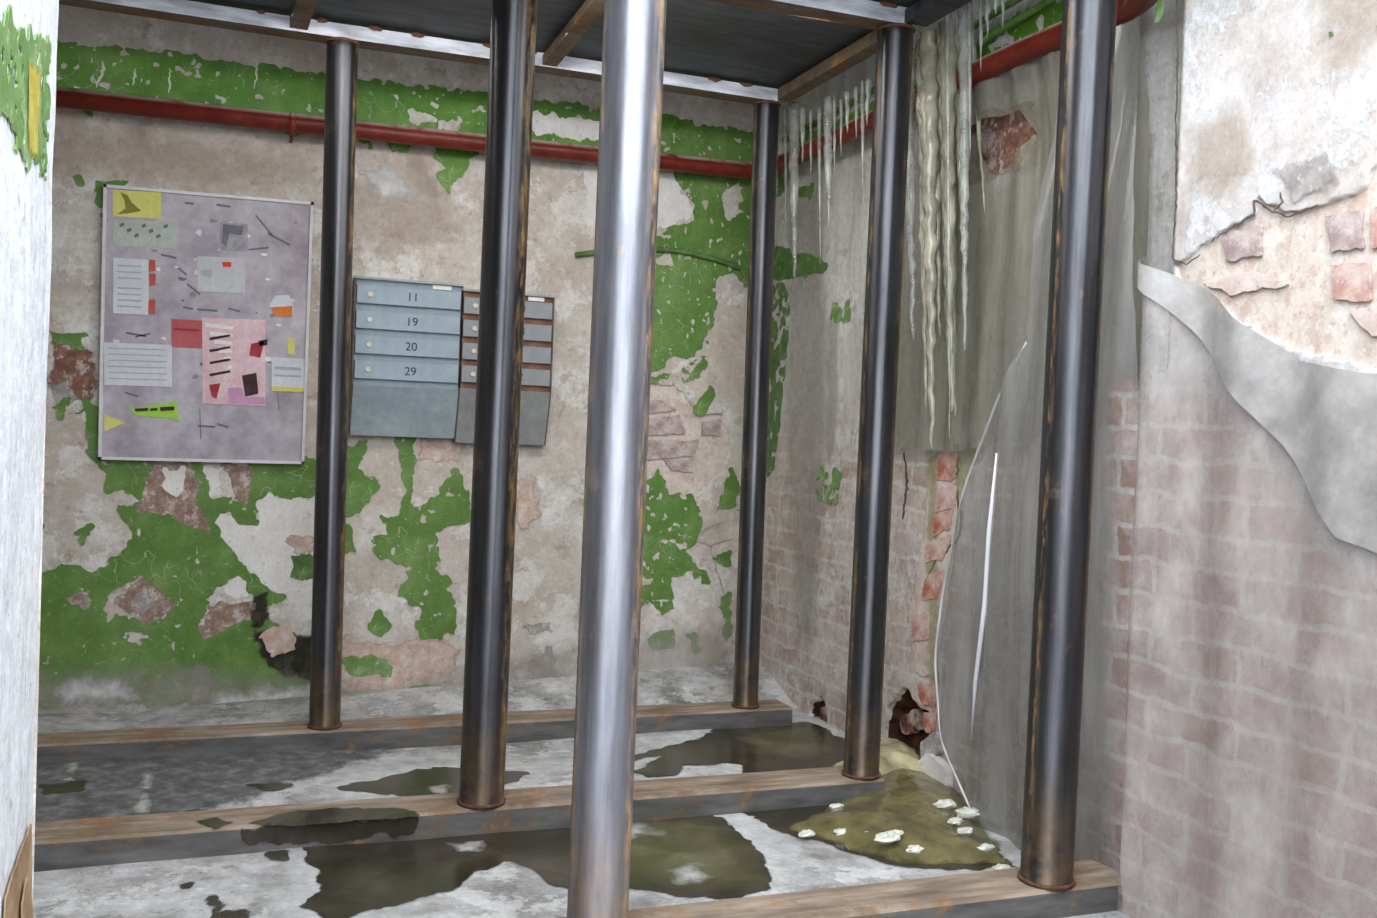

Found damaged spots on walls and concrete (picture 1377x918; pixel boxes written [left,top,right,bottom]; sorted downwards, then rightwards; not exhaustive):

peeling [0,4,326,181]
peeling [356,78,488,134]
spalling [532,99,600,146]
spalling [1173,153,1377,369]
peeling [641,113,753,654]
peeling [38,331,316,710]
water stain [35,747,570,918]
peeling [341,436,471,693]
water stain [634,715,845,777]
water stain [629,805,1020,901]
spalling [888,451,1011,870]
spalling [1115,386,1377,918]